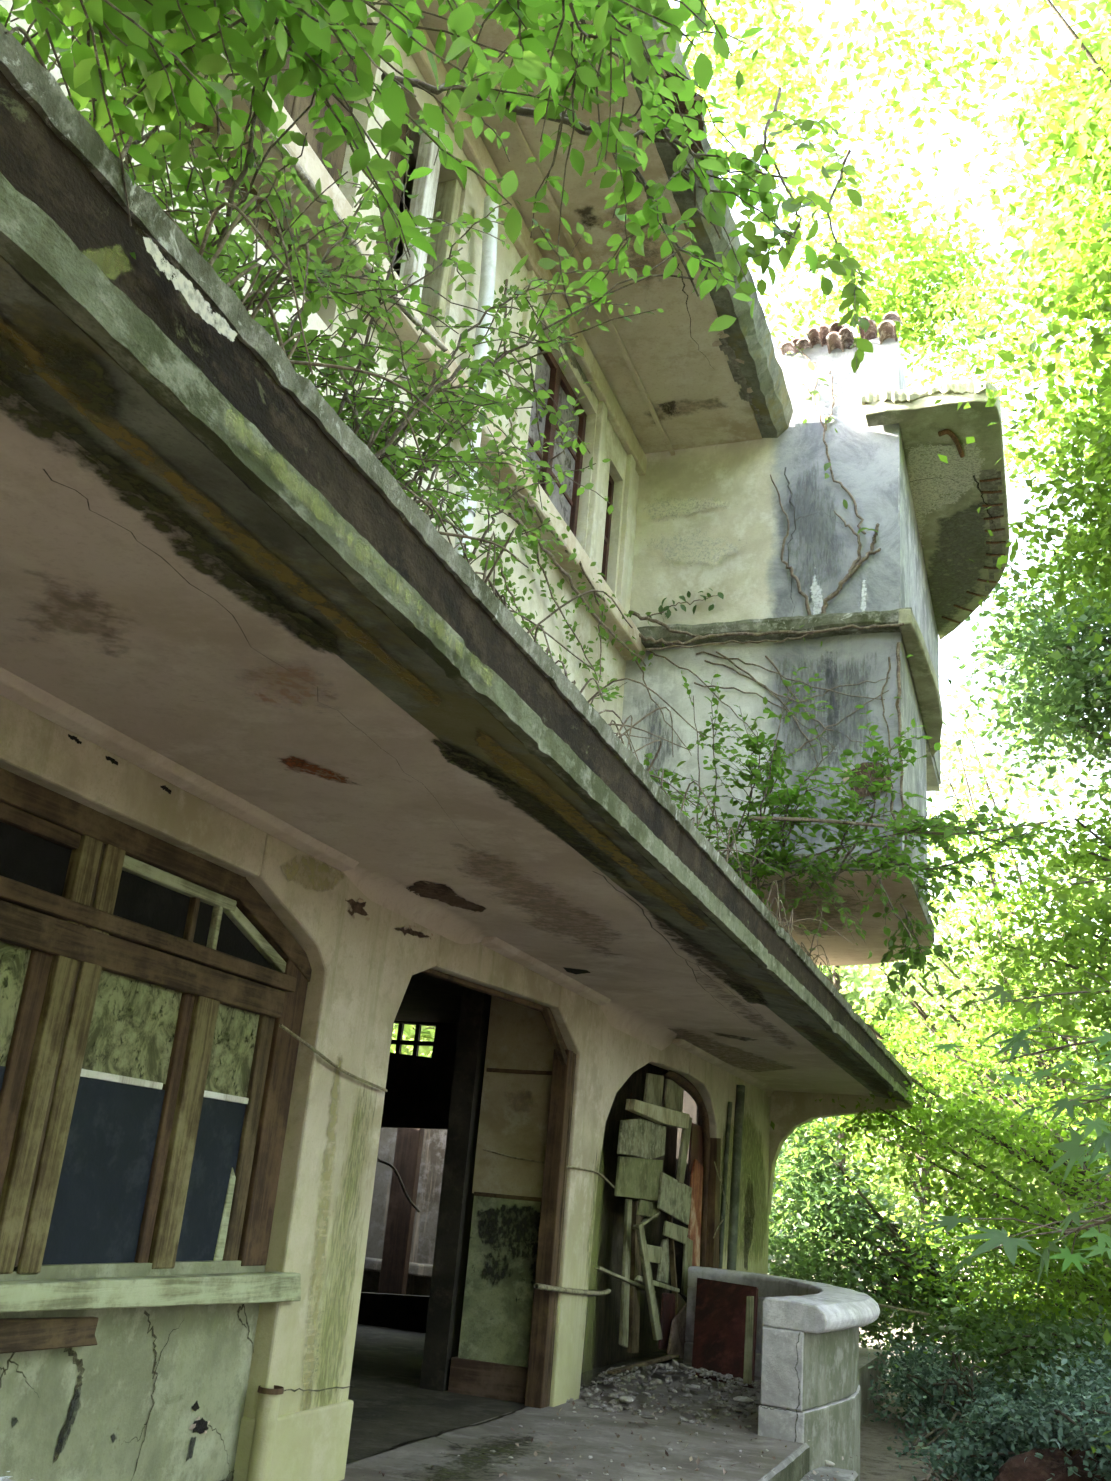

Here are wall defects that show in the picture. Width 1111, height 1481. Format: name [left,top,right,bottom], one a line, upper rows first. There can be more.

damp [789,470,838,615]
damp [928,503,991,631]
crack [43,469,491,861]
damp [777,652,876,766]
rust [280,756,356,784]
peeling [345,898,370,921]
peeling [406,881,487,914]
damp [303,1059,342,1410]
crack [0,1347,85,1464]
crack [121,1311,183,1480]
spalling [186,1401,210,1461]